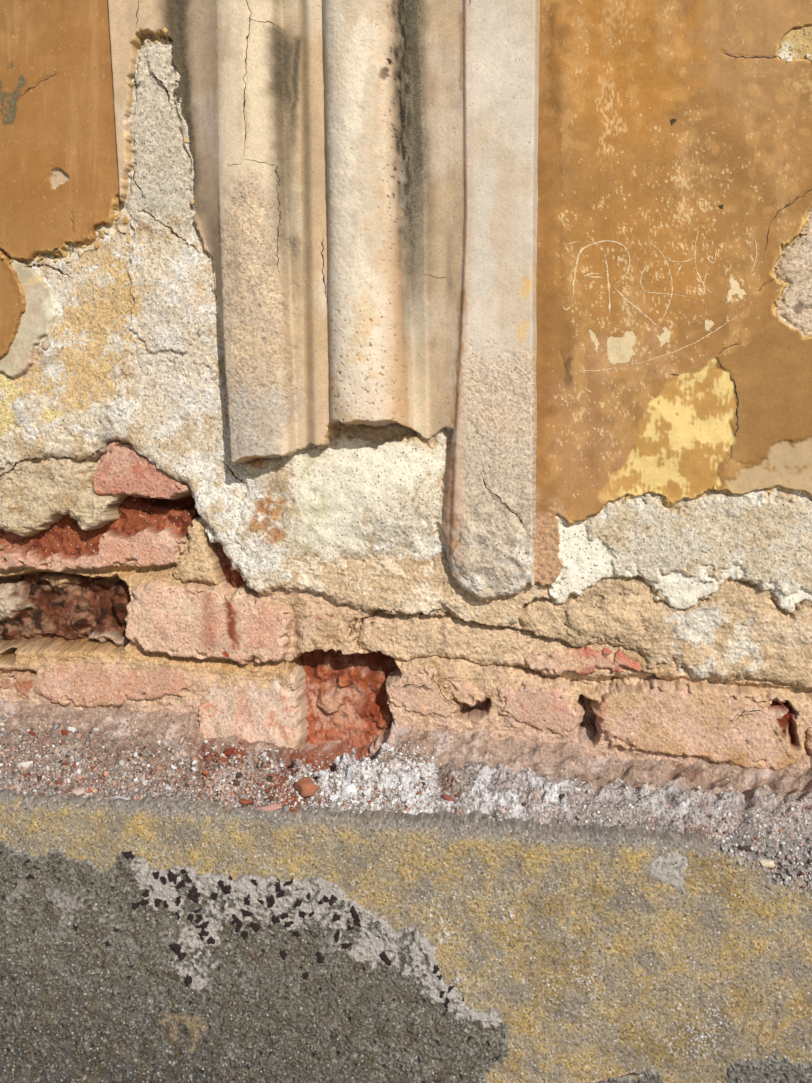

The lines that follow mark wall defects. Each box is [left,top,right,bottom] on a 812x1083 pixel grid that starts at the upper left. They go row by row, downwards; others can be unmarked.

crack [134,71,172,112]
crack [227,0,282,281]
crack [721,50,778,58]
crack [132,167,200,253]
flaking render [0,28,453,595]
peeling [589,330,636,364]
flaking render [773,208,812,337]
crack [480,469,524,528]
flaking render [548,358,812,613]
spalling [0,572,131,646]
spalling [301,649,399,747]
peeling [0,851,503,1029]